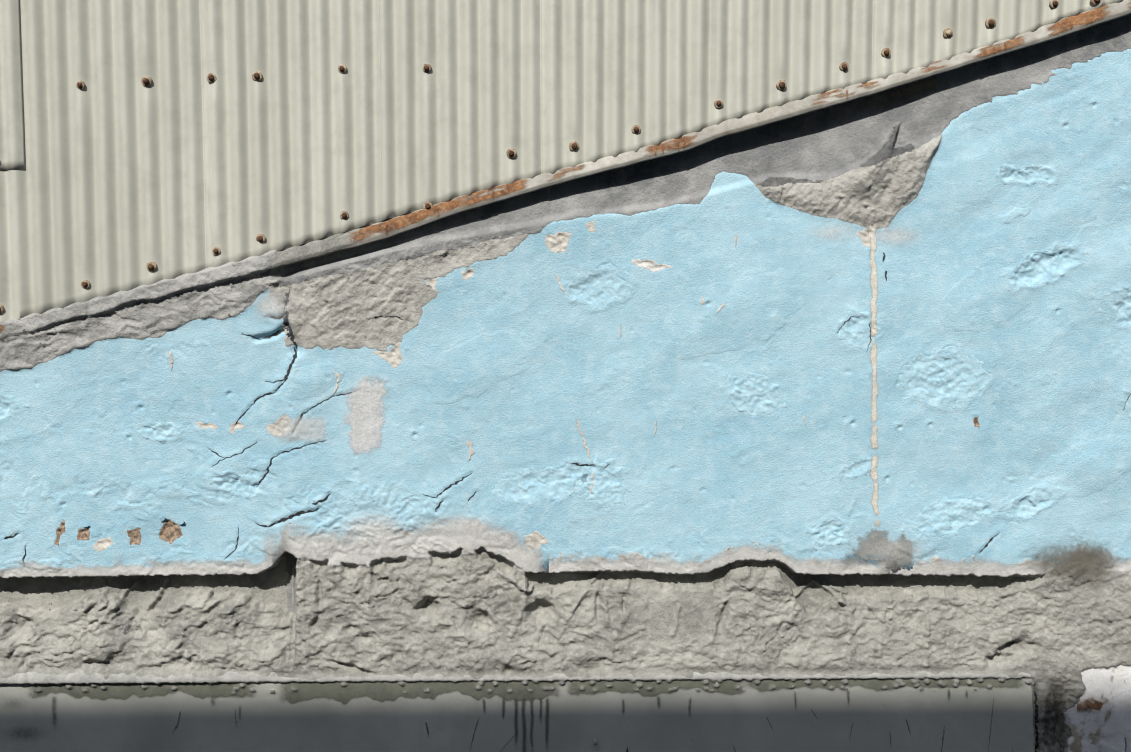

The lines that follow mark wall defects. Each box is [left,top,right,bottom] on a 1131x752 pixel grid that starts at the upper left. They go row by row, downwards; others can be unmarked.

corrosion [977,36,1023,57]
corrosion [1049,6,1107,35]
corrosion [647,136,696,154]
corrosion [350,179,526,242]
flaking render [260,14,1131,368]
crack [210,289,355,487]
peeling [344,376,386,453]
crack [837,223,887,526]
hole [491,455,632,509]
peeling [54,521,114,552]
peeling [127,527,142,545]
crack [226,494,330,558]